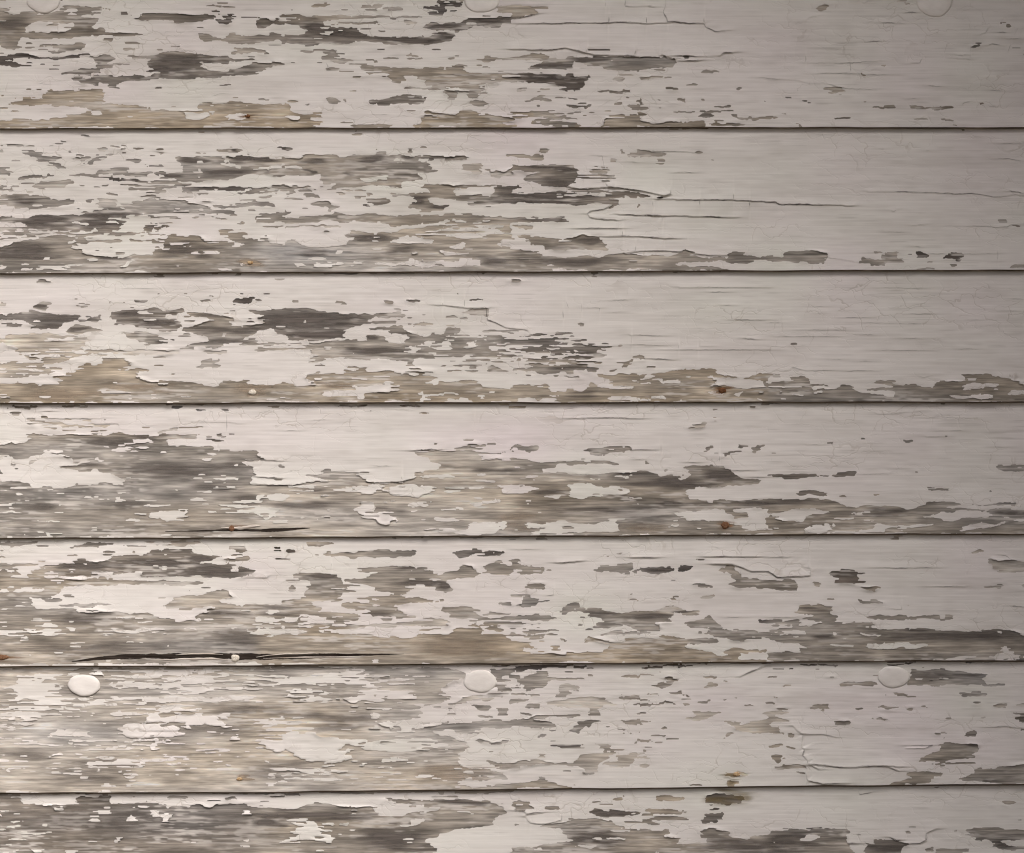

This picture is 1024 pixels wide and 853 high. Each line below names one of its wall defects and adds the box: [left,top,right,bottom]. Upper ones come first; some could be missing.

peeling [0,0,786,136]
spalling [910,105,964,131]
peeling [0,141,828,283]
peeling [0,293,1024,853]